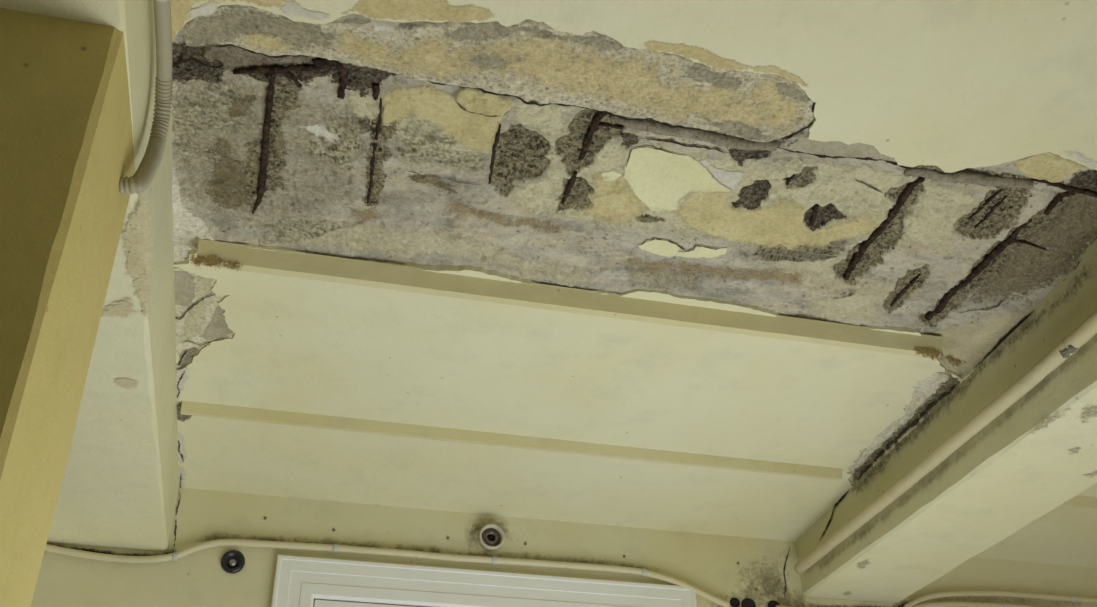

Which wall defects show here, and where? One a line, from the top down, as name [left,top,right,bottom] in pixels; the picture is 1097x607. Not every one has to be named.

corrosion [172,43,399,206]
corrosion [347,121,400,225]
corrosion [445,109,640,236]
spalling [171,0,1097,485]
corrosion [726,147,772,167]
corrosion [831,165,944,286]
corrosion [882,265,930,314]
corrosion [919,168,1097,328]
crack [176,368,189,401]
crack [173,430,188,550]